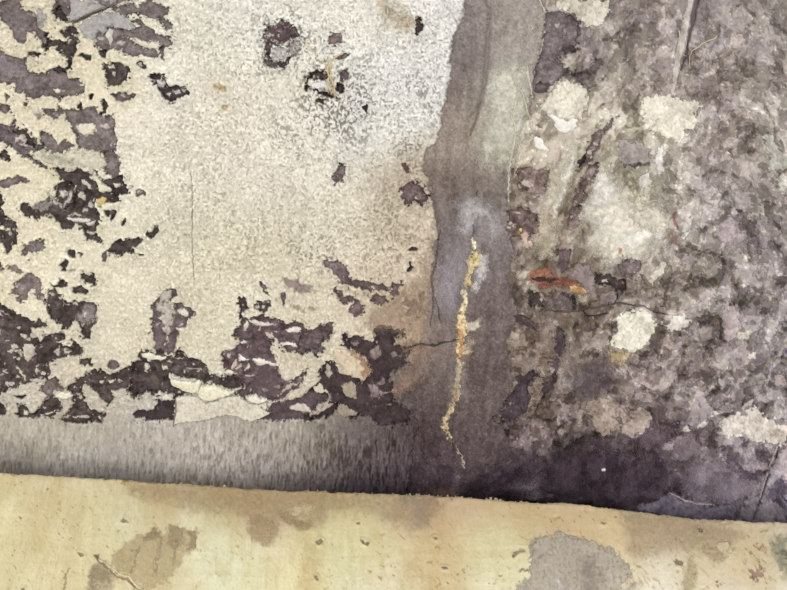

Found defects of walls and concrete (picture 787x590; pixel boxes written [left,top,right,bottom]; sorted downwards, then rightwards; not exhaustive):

spalling [262,18,300,69]
spalling [389,13,424,36]
spalling [304,64,349,104]
peeling [0,0,190,262]
leakage [482,64,526,164]
spalling [398,163,431,207]
rust [517,267,588,303]
spalling [0,249,424,428]
crack [406,190,498,469]
leakage [466,421,787,512]
leakage [250,498,318,545]
leakage [89,564,113,590]